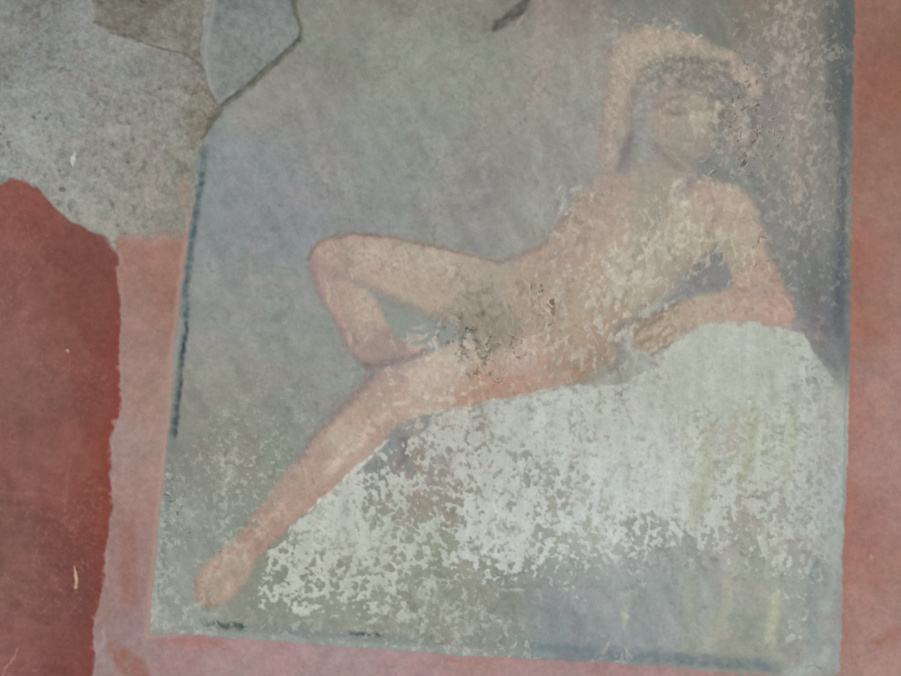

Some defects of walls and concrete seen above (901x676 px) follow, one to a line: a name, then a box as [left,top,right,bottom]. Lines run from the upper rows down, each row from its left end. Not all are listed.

spalling [89,0,208,75]
peeling [150,0,861,666]
peeling [116,520,142,610]